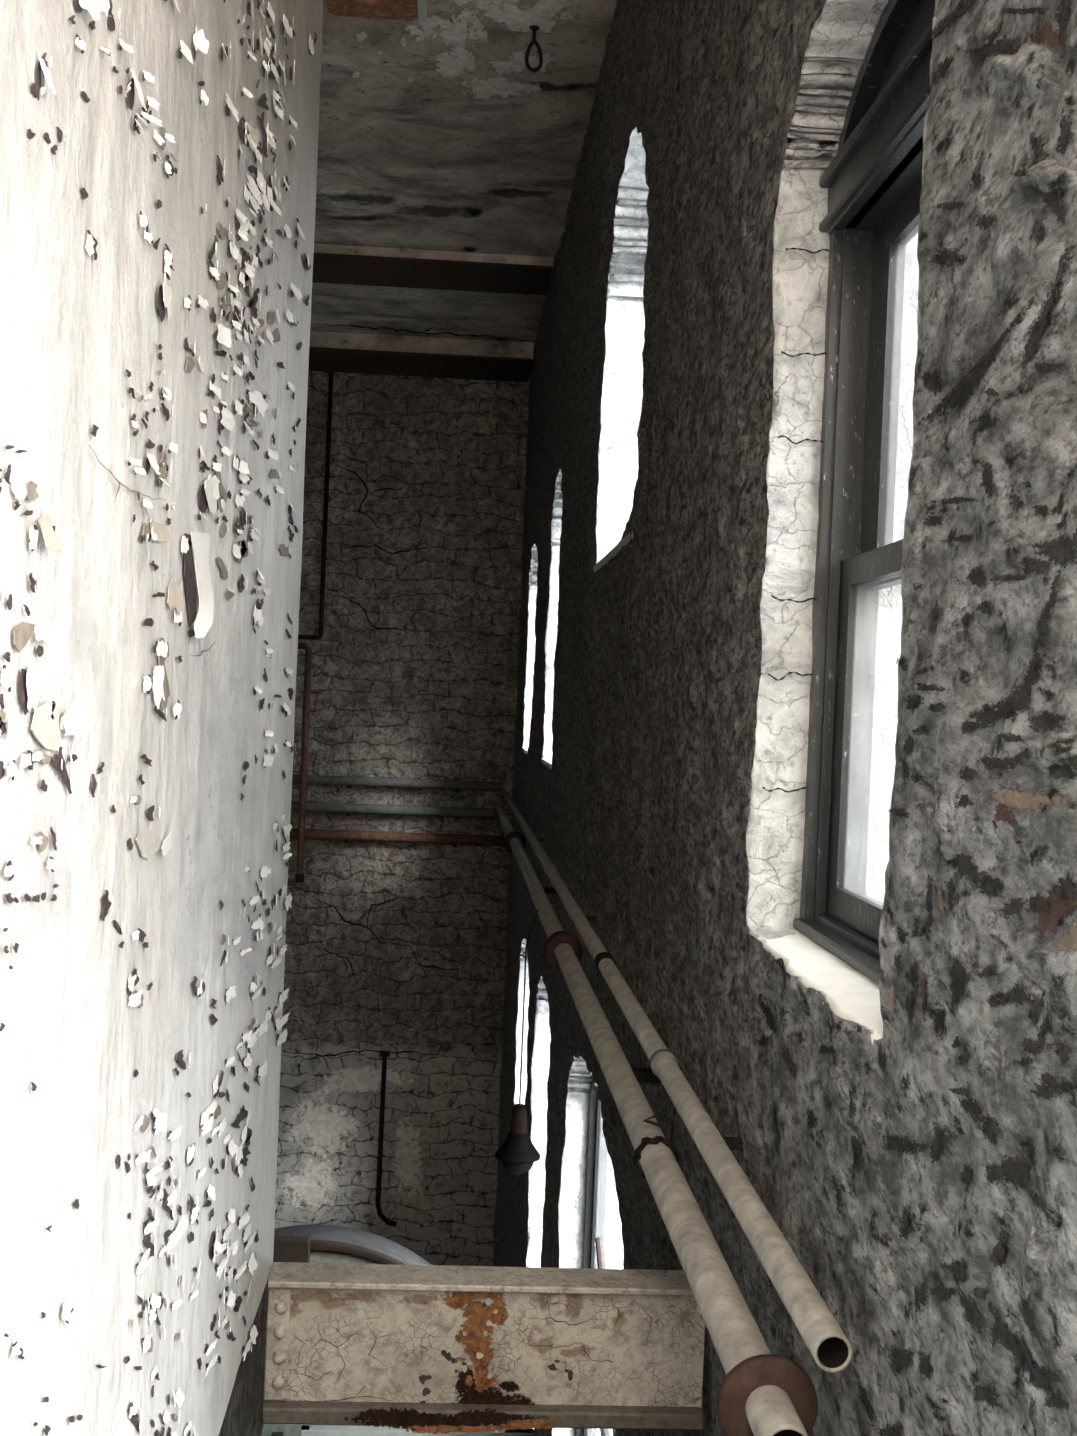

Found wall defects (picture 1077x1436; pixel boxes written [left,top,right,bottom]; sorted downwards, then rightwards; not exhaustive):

peeling [69,0,180,178]
peeling [126,0,317,722]
crack [781,350,826,358]
crack [778,435,823,444]
crack [771,595,816,603]
peeling [0,561,86,794]
crack [767,672,813,681]
crack [762,785,808,793]
peeling [100,890,149,948]
peeling [116,813,292,1436]
rust [290,1290,379,1317]
rust [344,1291,557,1435]